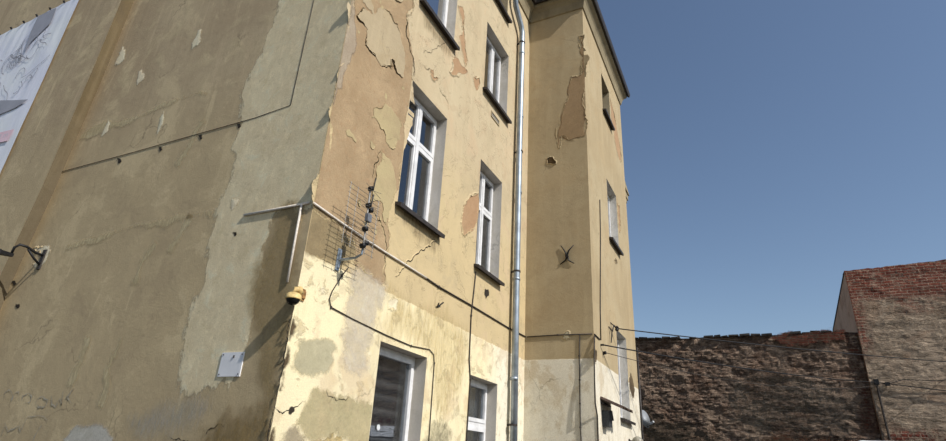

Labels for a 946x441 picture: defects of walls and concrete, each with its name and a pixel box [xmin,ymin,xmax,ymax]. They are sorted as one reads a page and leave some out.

flaking render [449,5,480,90]
flaking render [546,34,590,166]
peeling [176,0,415,397]
crack [370,152,438,282]
flaking render [460,192,479,238]
leakage [252,207,296,400]
crack [267,311,305,441]
leakage [286,388,372,441]